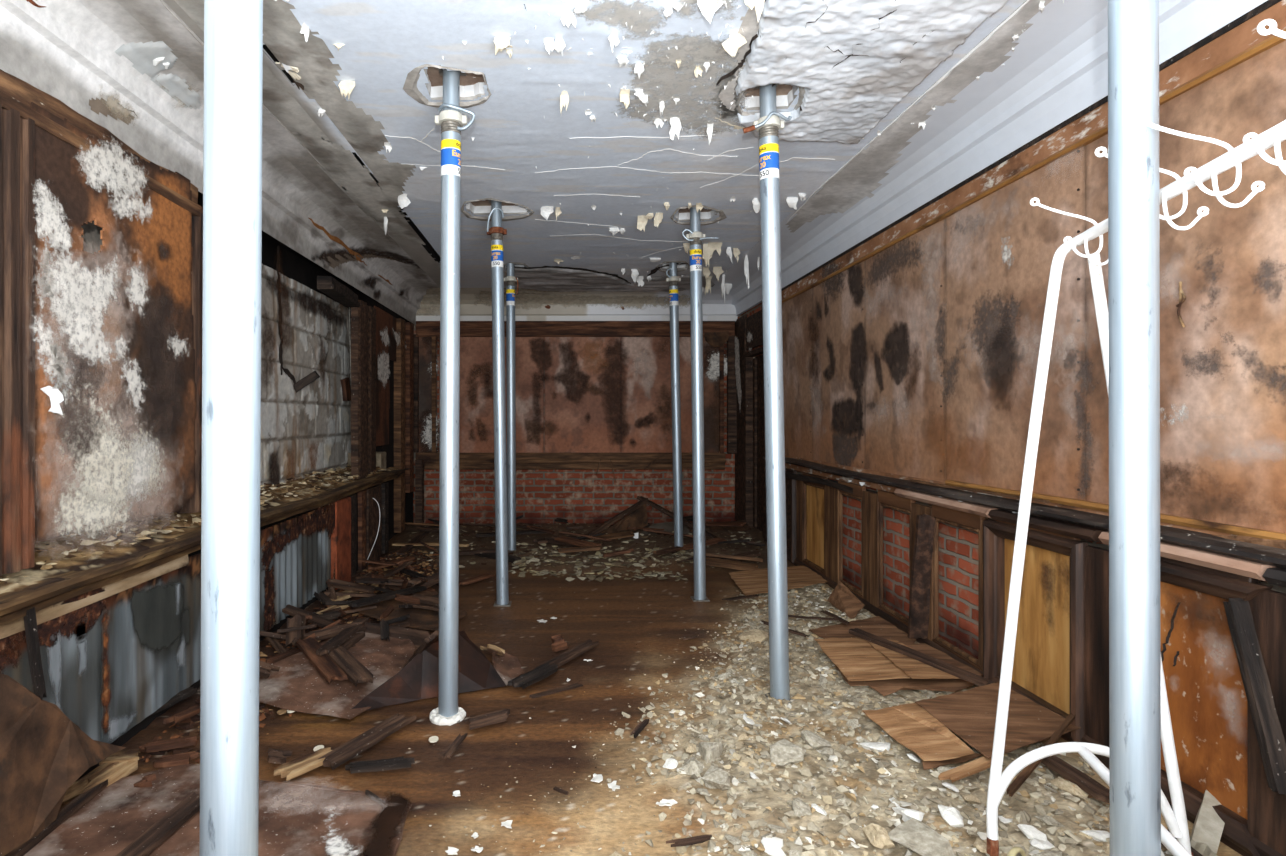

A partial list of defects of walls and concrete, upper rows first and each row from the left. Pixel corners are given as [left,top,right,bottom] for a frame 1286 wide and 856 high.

peeling [262,0,427,245]
peeling [608,29,681,140]
flaking render [718,0,765,116]
peeling [786,0,1064,232]
water stain [77,143,152,220]
flaking render [609,197,735,236]
peeling [621,242,760,304]
mould [33,183,187,538]
water stain [525,339,672,445]
water stain [703,344,727,446]
water stain [809,235,1038,466]
corrosion [0,587,111,733]